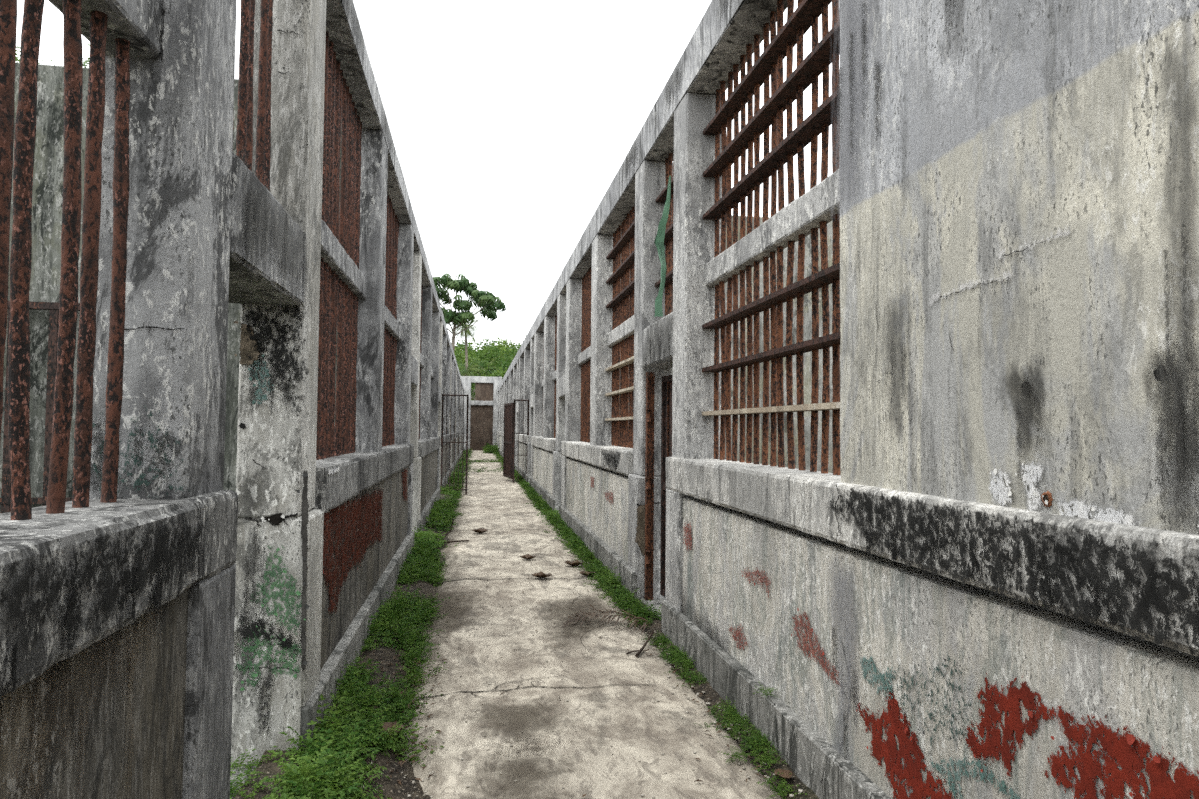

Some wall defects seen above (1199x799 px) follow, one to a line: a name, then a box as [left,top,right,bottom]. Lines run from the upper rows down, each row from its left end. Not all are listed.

leakage [237,179,311,417]
crack [929,226,1069,417]
leakage [1145,58,1199,532]
mould [0,512,208,694]
crack [245,513,298,527]
peeling [235,471,310,691]
peeling [322,488,383,616]
peeling [729,624,748,650]
peeling [791,608,1199,799]
leakage [826,488,1199,660]
leakage [1006,367,1043,484]
spalling [988,461,1135,526]